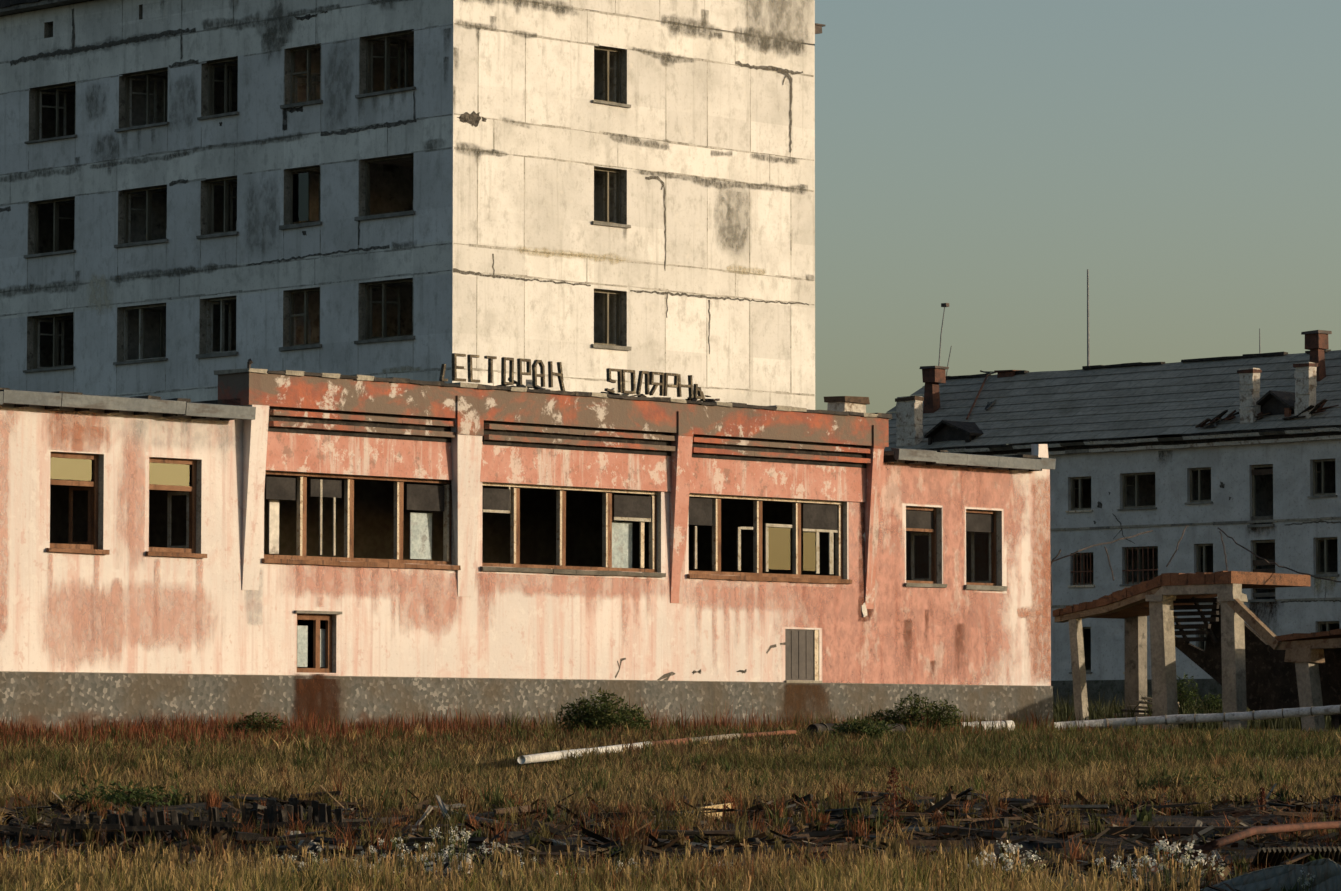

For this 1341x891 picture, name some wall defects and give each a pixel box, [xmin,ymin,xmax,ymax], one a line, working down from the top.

leakage [203,5,339,50]
leakage [662,14,804,53]